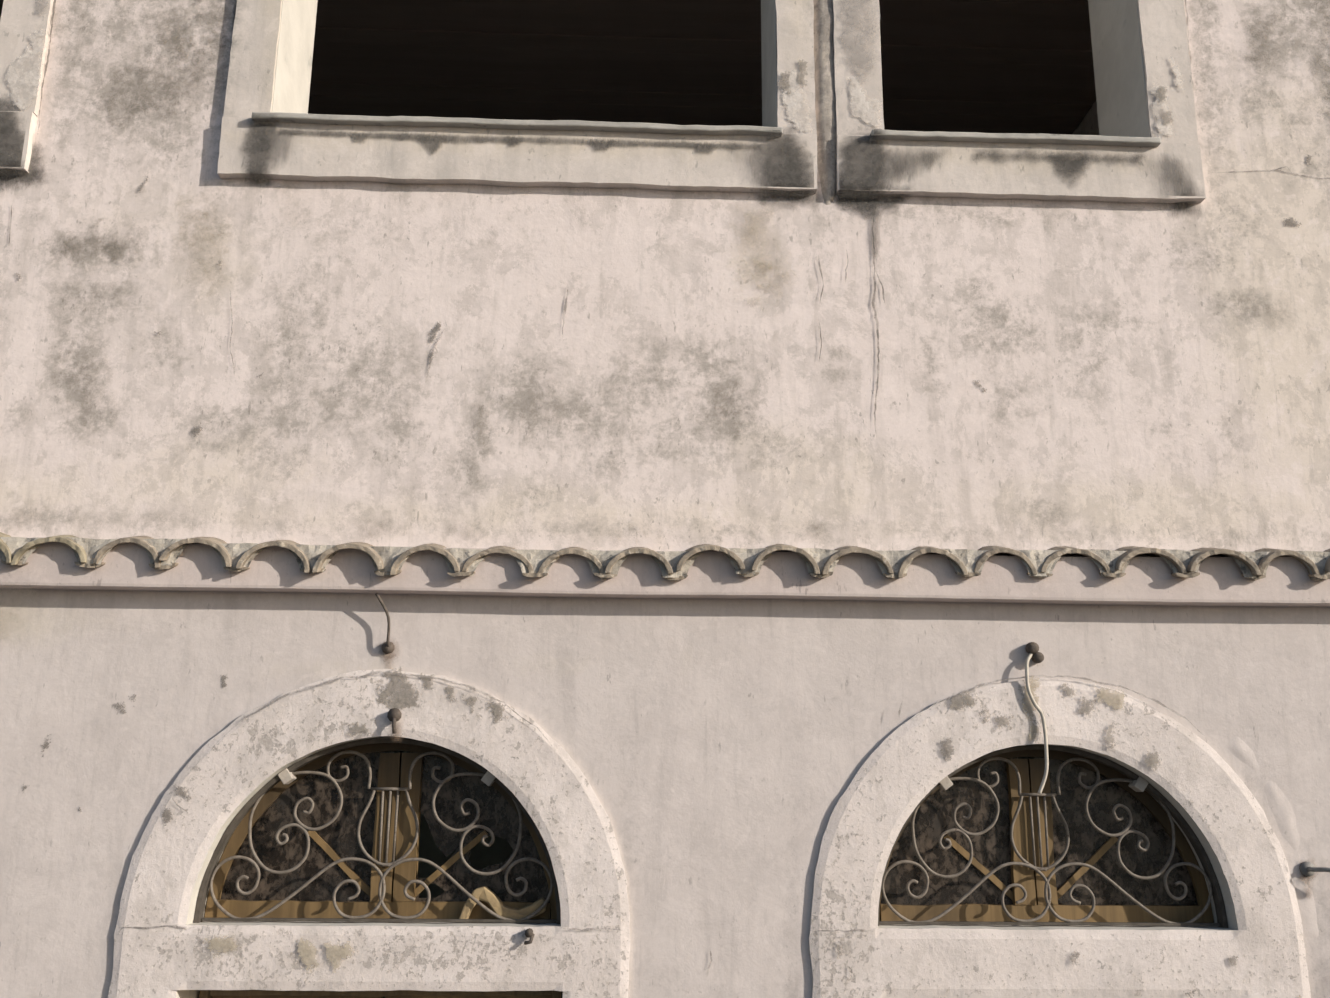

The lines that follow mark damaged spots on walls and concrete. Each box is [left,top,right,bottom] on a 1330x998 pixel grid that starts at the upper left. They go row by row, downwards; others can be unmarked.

damp [0,100,42,187]
crack [818,219,885,419]